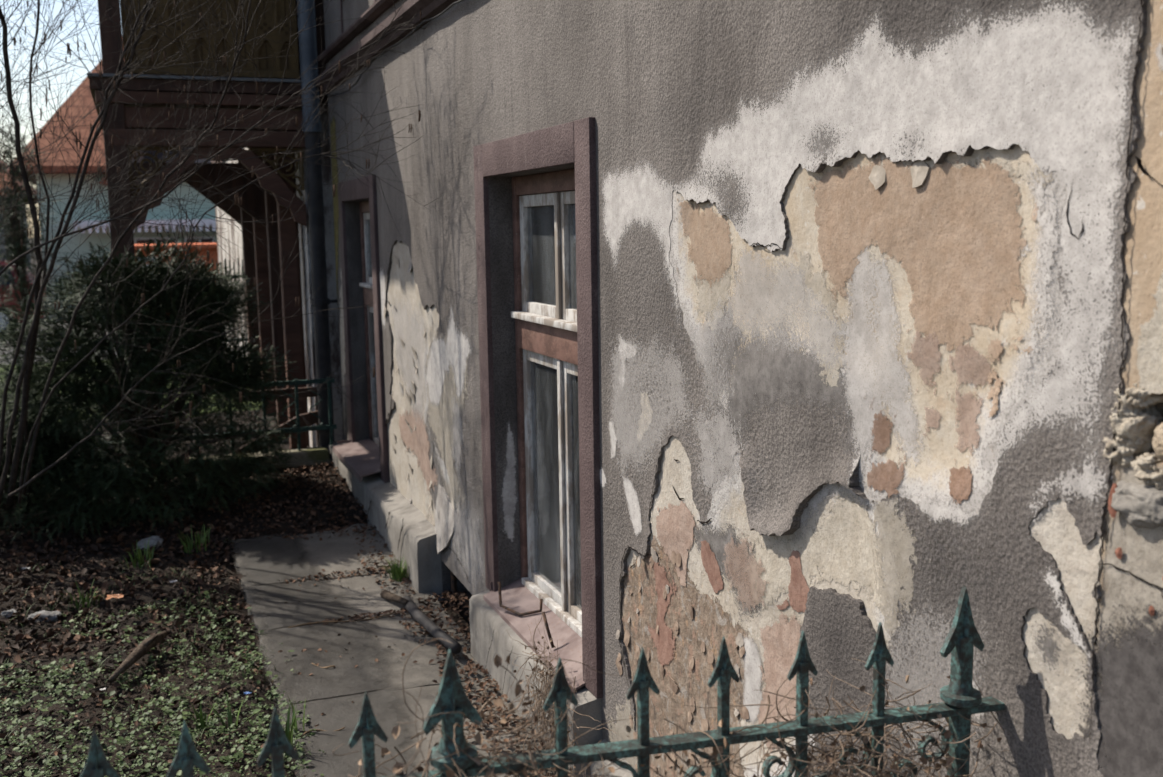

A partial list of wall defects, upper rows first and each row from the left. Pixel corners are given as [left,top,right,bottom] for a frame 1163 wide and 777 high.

flaking render [383,241,455,554]
peeling [635,734,815,777]
flaking render [616,144,1067,739]
damp [600,0,1163,723]
flaking render [1023,462,1124,739]
crack [1088,0,1163,757]
flaking render [1120,0,1163,394]